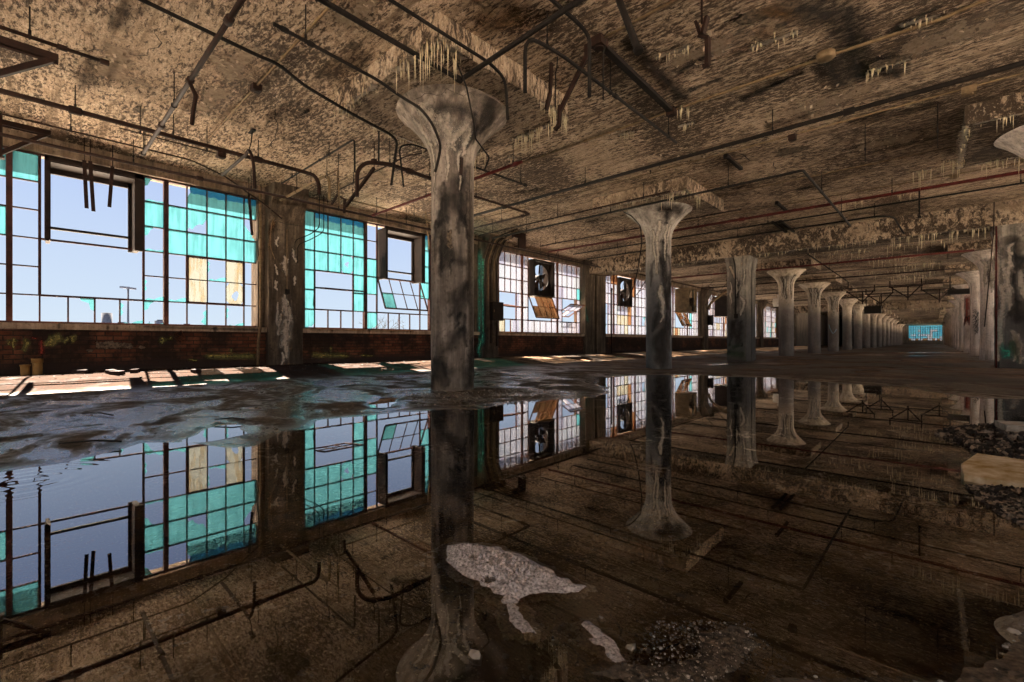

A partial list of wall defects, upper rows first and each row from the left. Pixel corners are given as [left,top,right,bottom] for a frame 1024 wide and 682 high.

leakage [784,0,904,88]
leakage [892,7,940,31]
leakage [413,96,498,276]
leakage [431,283,500,390]
leakage [650,205,682,367]
leakage [982,235,1024,364]